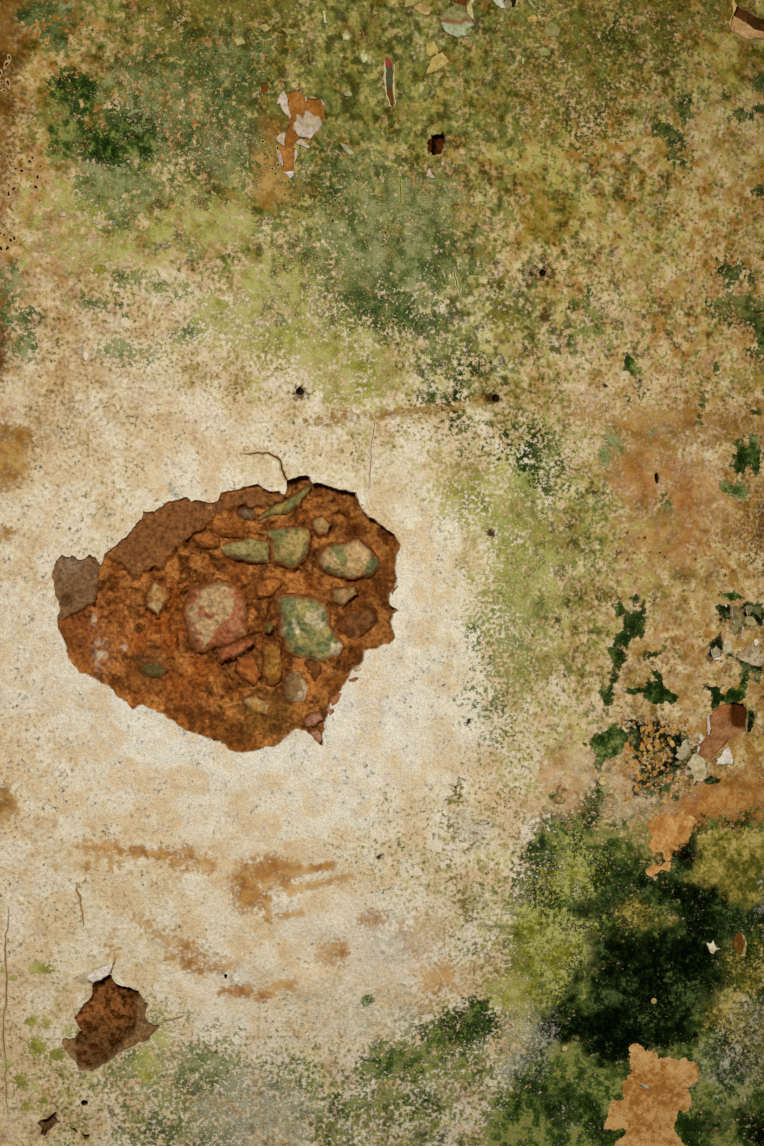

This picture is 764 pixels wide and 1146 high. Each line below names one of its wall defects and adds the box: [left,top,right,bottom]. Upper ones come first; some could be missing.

peeling [426,40,449,74]
peeling [405,0,475,38]
flaking render [724,36,764,81]
peeling [253,84,325,197]
leakage [0,288,8,374]
spalling [52,475,401,753]
peeling [708,573,764,699]
peeling [668,702,761,785]
peeling [525,749,697,877]
leakage [656,769,764,855]
spalling [62,960,184,1072]
peeling [604,1043,699,1146]